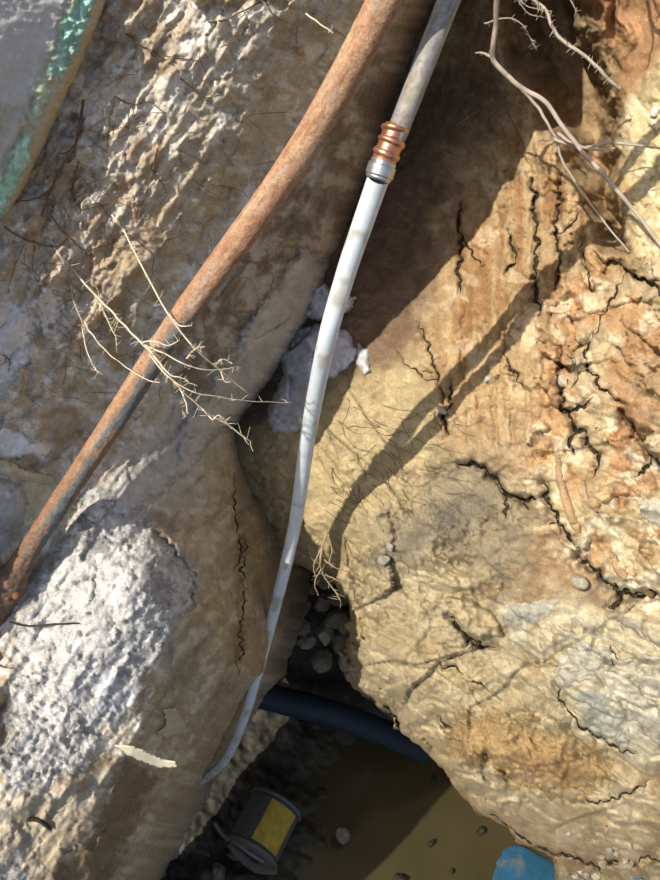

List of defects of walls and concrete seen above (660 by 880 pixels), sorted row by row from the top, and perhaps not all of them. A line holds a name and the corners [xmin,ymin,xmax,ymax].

efflorescence [0,283,66,399]
spalling [0,474,202,797]
crack [232,474,249,676]